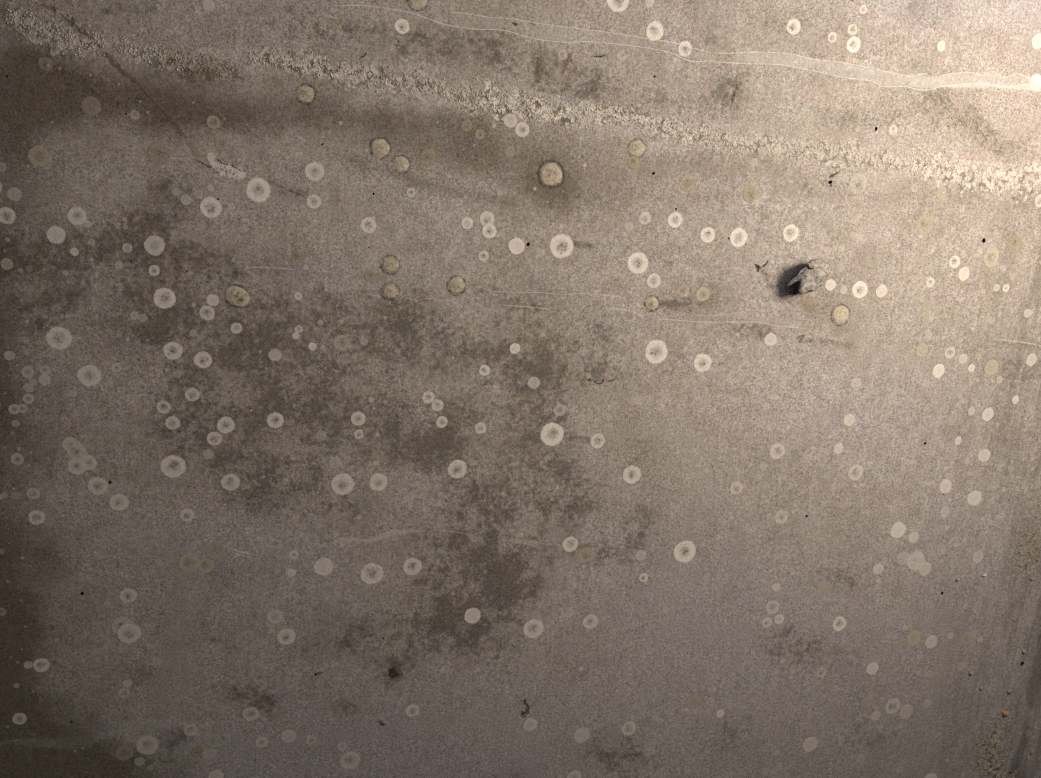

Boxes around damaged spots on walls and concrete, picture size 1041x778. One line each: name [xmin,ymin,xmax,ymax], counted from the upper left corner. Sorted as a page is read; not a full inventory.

leakage [246,177,270,202]
leakage [46,207,91,256]
leakage [122,236,165,276]
leakage [508,237,525,255]
leakage [550,234,574,259]
leakage [154,288,176,309]
leakage [933,347,998,378]
leakage [422,391,448,428]
leakage [207,417,235,445]
leakage [541,404,565,446]
leakage [448,460,467,478]
efflorescence [464,608,480,624]